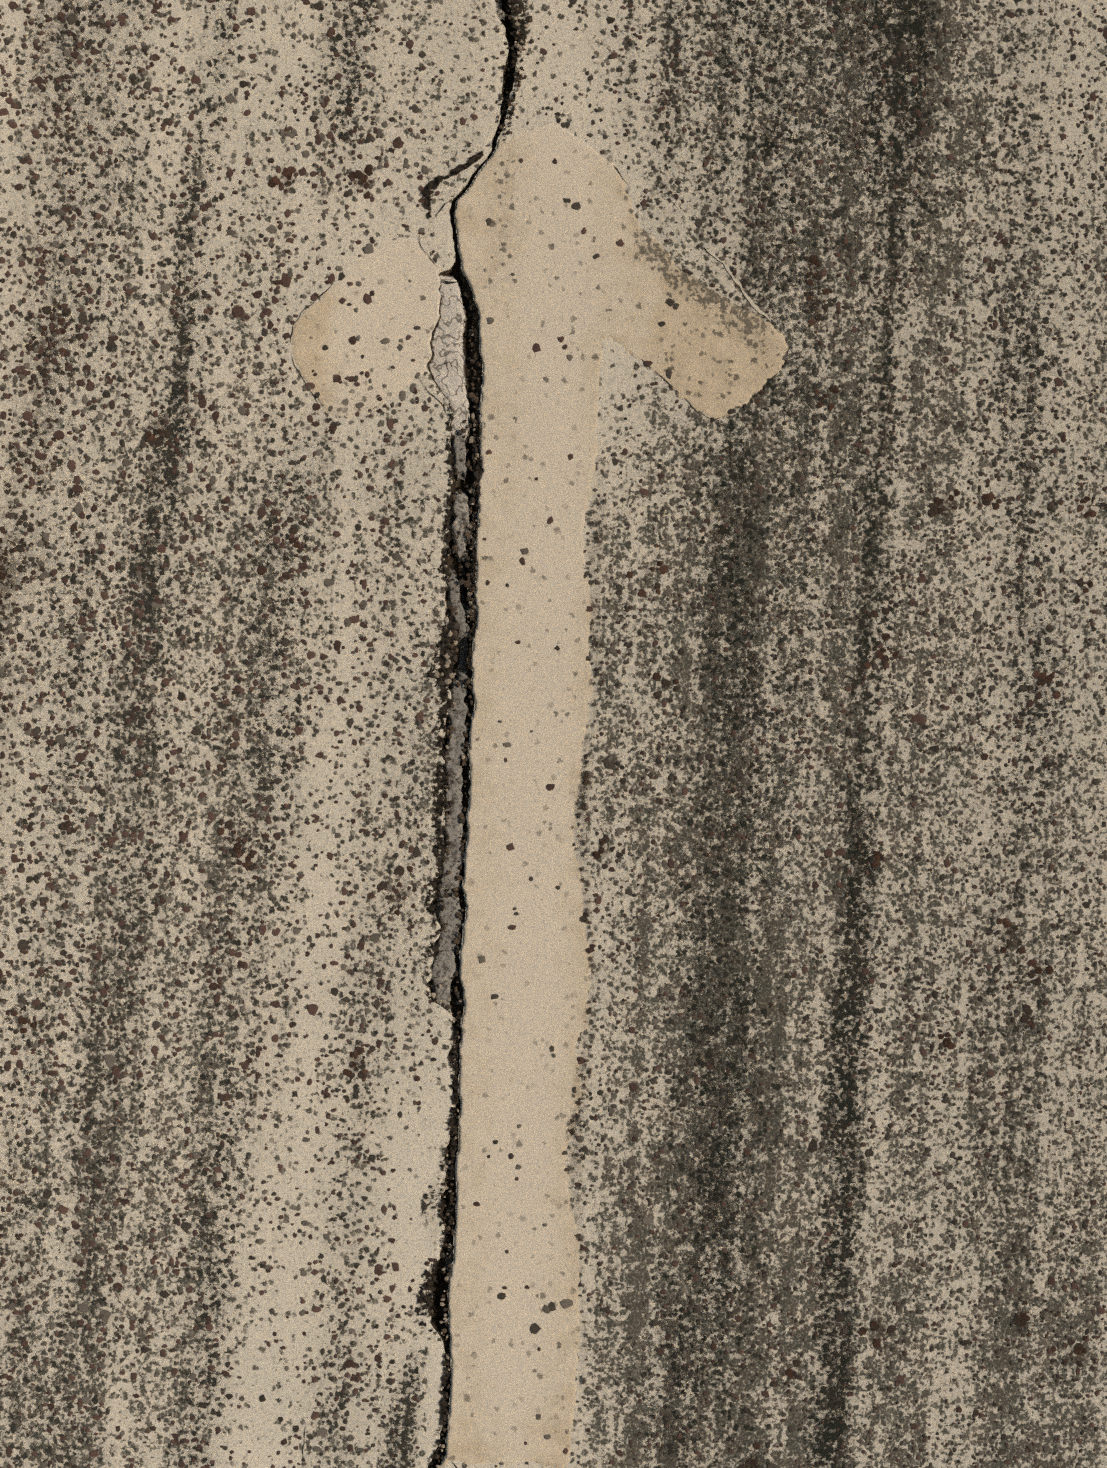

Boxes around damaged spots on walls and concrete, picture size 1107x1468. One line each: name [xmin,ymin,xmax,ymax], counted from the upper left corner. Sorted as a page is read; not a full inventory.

crack [414,0,524,1468]